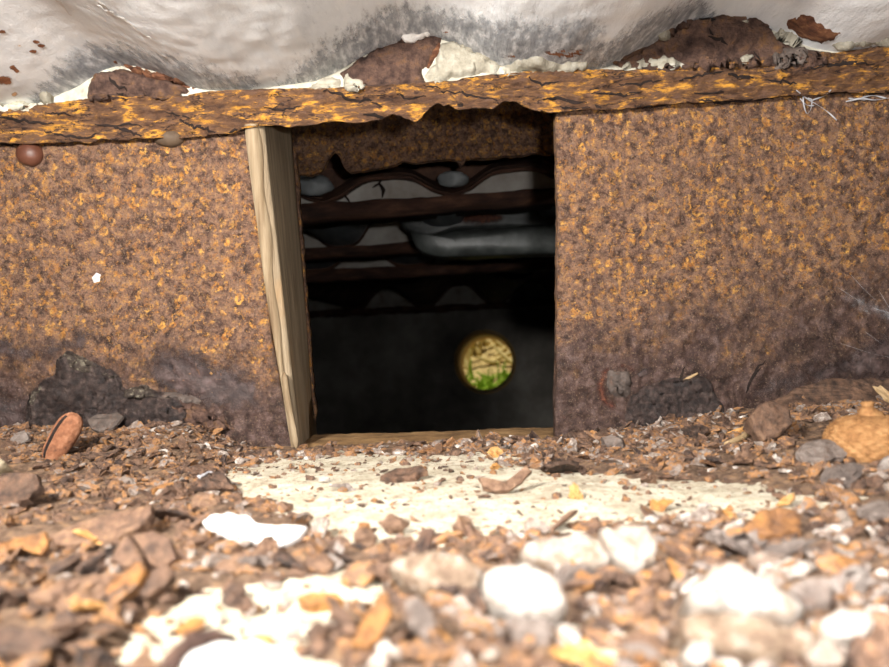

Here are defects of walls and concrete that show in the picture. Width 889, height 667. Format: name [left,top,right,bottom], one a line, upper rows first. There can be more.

peeling [286,0,840,88]
peeling [33,45,257,103]
crack [0,112,150,139]
crack [165,111,245,137]